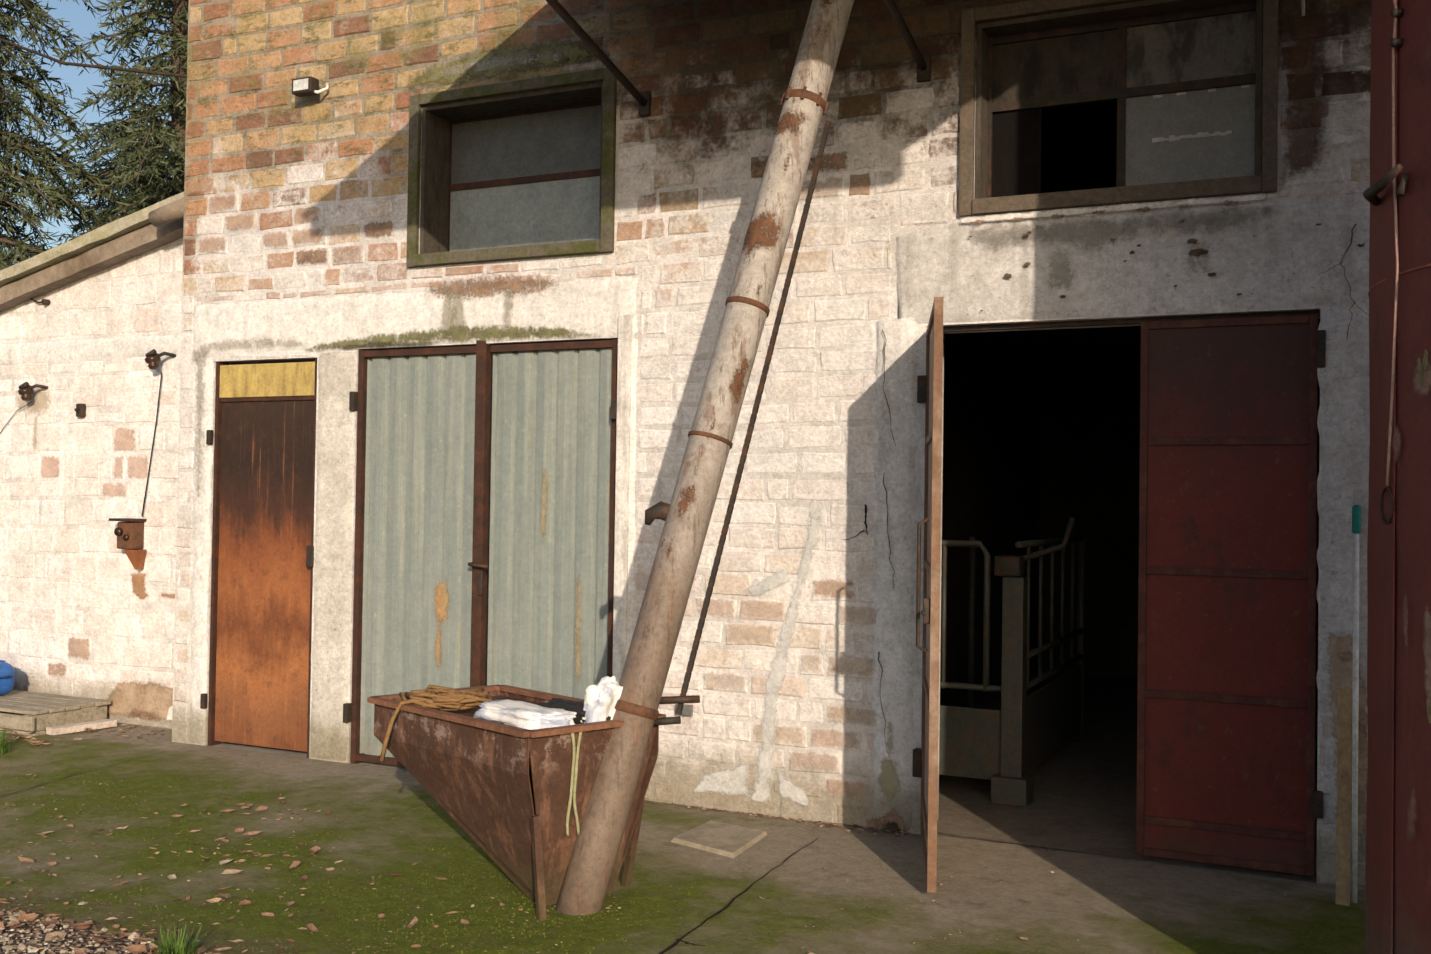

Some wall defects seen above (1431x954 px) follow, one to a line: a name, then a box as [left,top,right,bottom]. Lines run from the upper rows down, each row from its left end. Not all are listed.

crack [1319,224,1367,340]
corrosion [435,582,449,666]
peeling [1423,608,1431,724]